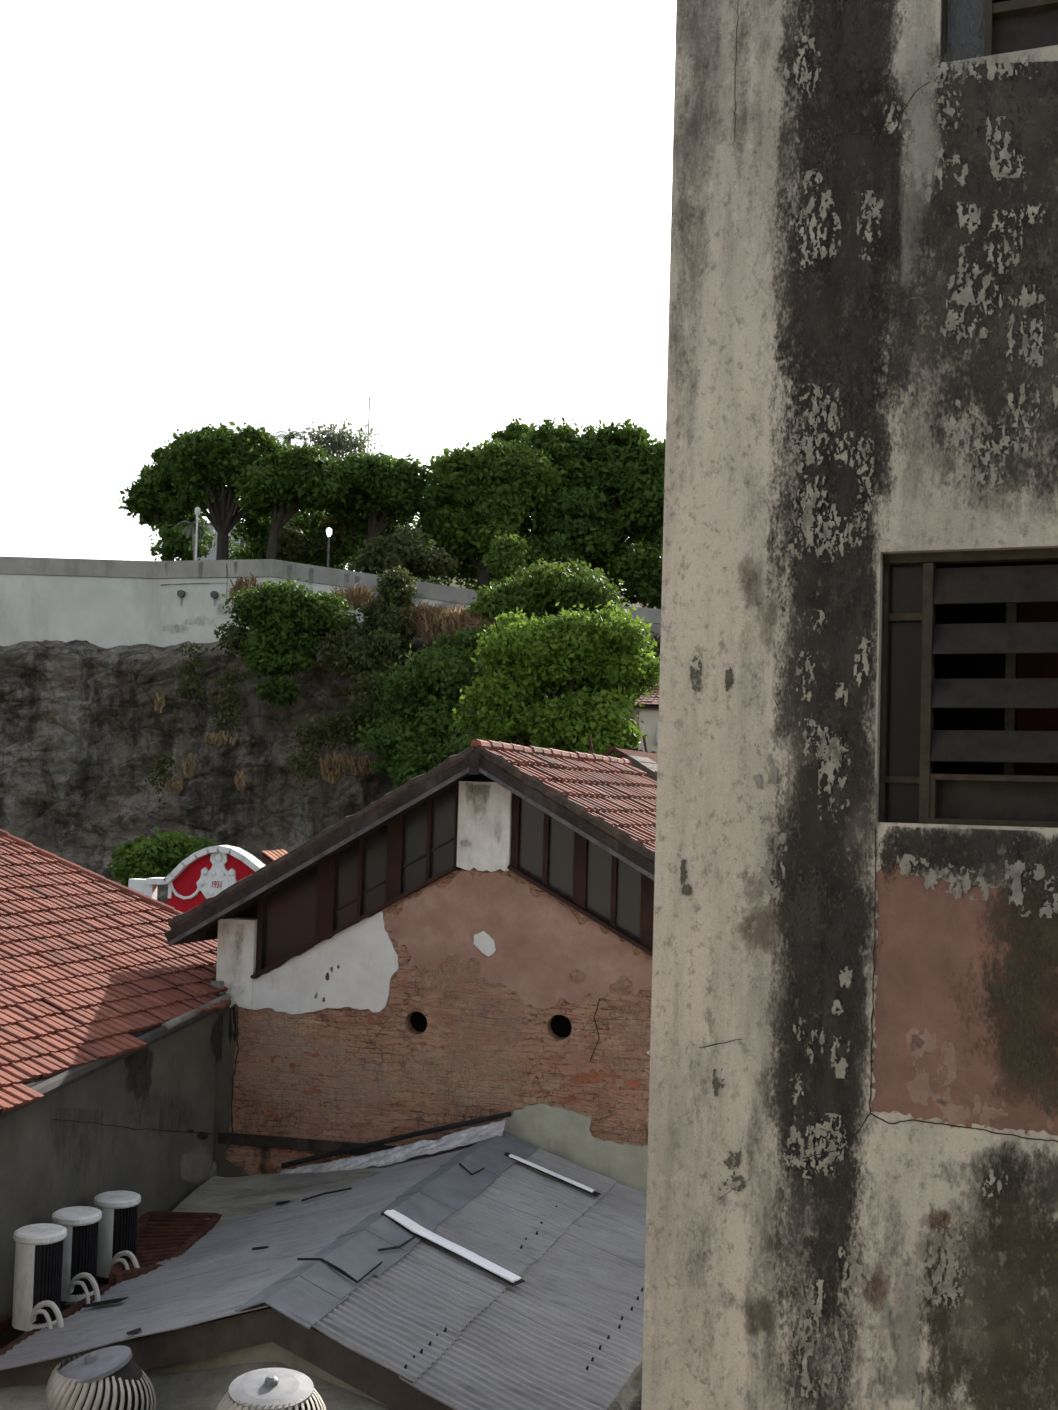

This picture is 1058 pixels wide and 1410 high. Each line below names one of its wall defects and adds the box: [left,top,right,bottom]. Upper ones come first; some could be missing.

peeling [777,36,821,99]
peeling [789,169,883,272]
peeling [785,383,875,562]
water stain [741,0,1058,1410]
peeling [187,871,652,1193]
crack [590,998,600,1062]
peeling [784,1017,850,1179]
peeling [832,966,852,1016]
spalling [869,854,1058,1136]